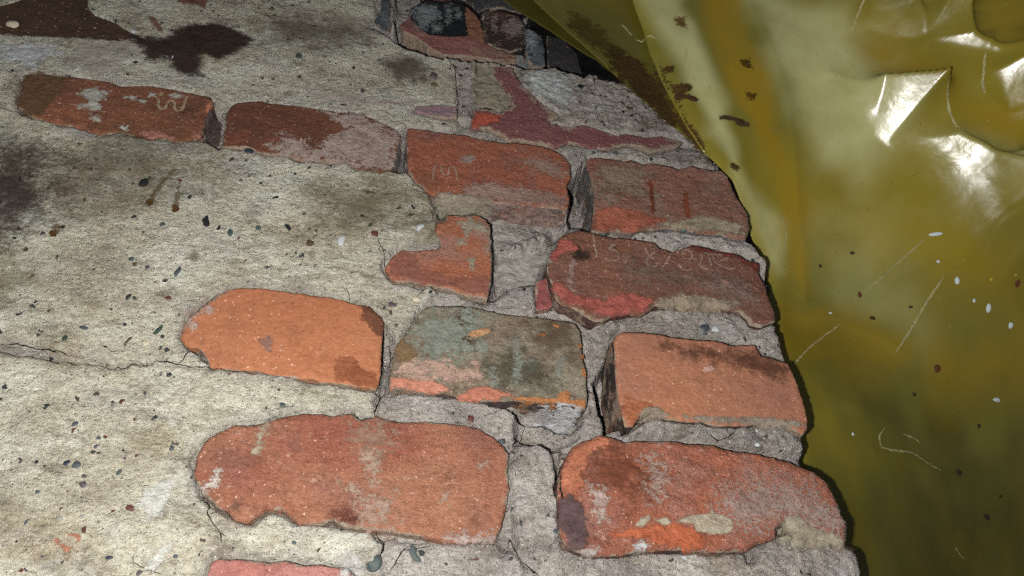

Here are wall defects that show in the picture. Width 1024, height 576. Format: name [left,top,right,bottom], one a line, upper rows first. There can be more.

leakage [0,24,253,77]
crack [1,343,68,356]
crack [92,345,246,372]